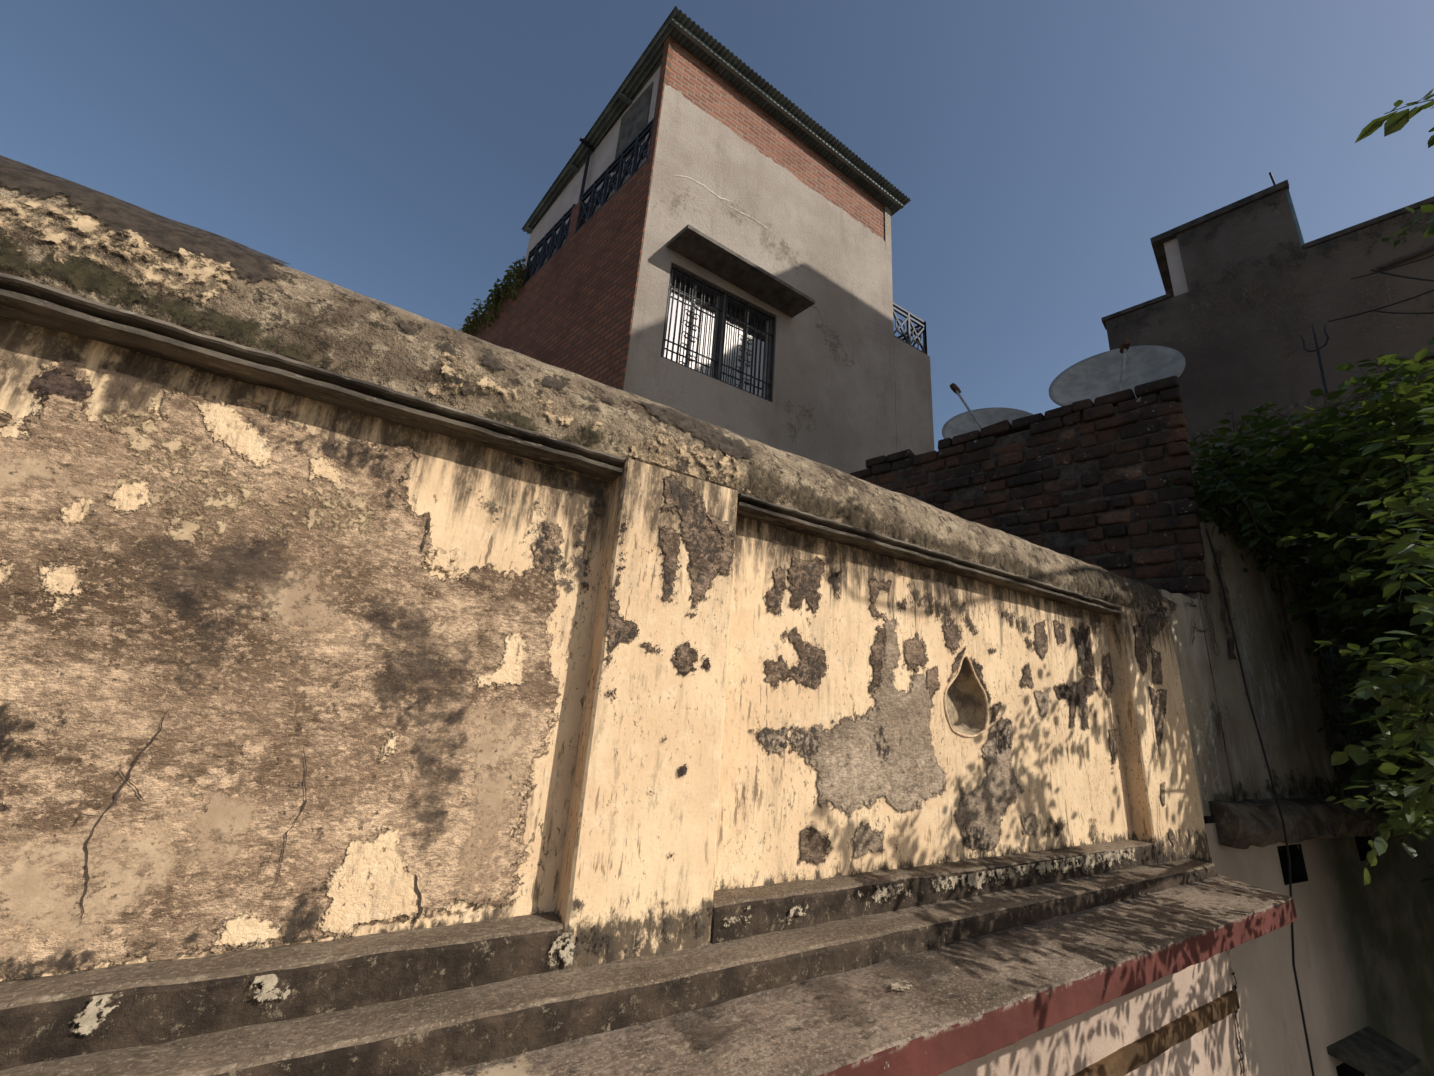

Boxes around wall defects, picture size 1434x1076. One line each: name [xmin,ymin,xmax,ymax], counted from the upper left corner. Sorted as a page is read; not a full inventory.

water stain [0,155,289,283]
water stain [58,342,207,413]
crack [72,707,170,925]
water stain [142,537,292,610]
peeling [0,360,567,981]
water stain [365,599,469,849]
peeling [603,426,755,678]
peeling [763,555,843,689]
peeling [798,826,833,866]
peeling [749,578,1038,859]
peeling [1020,620,1114,730]
peeling [1107,728,1118,774]